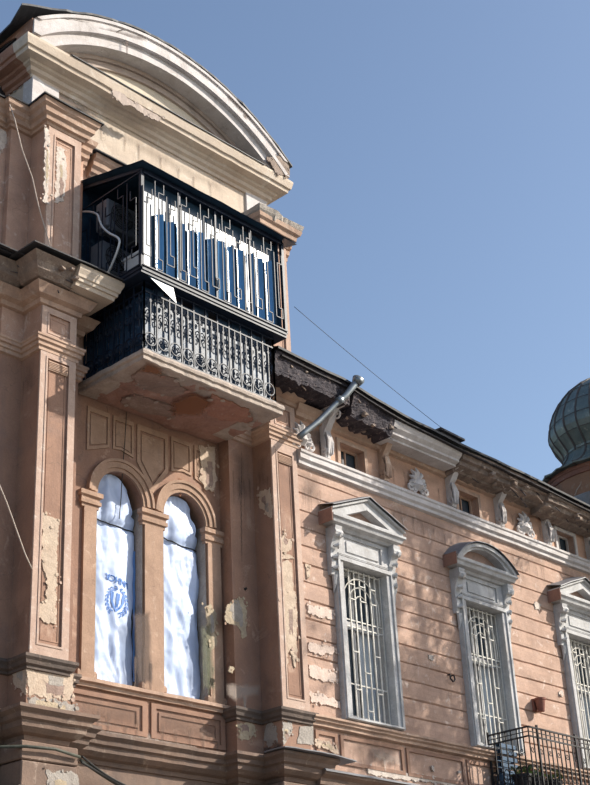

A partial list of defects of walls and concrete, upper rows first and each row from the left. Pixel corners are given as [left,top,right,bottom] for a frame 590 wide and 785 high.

peeling [40,125,67,204]
spalling [203,393,254,424]
peeling [198,444,221,496]
peeling [256,487,273,518]
peeling [39,511,62,627]
peeling [202,596,250,650]
peeling [278,529,339,668]
peeling [11,669,79,711]
peeling [308,665,342,715]
peeling [235,721,339,754]
peeling [44,766,79,785]